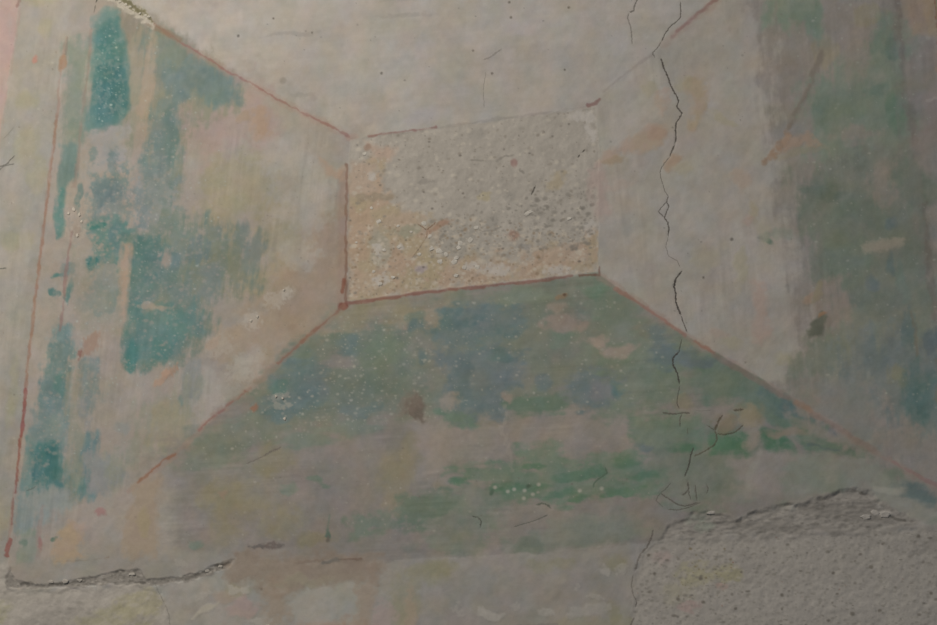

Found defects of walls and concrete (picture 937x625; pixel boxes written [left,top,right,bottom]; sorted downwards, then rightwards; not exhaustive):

flaking render [106,0,157,31]
crack [626,0,744,511]
flaking render [0,561,223,625]
crack [630,529,654,625]
flaking render [627,524,937,625]